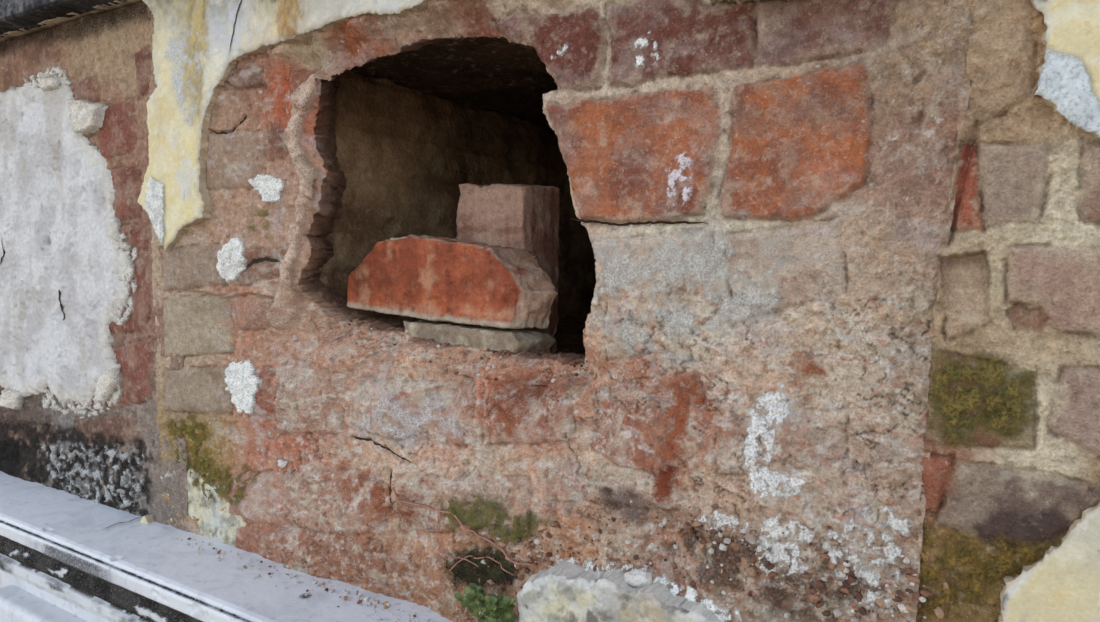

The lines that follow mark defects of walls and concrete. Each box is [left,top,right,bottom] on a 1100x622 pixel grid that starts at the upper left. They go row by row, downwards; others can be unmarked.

leakage [0,421,153,517]
spalling [0,1,204,536]
spalling [151,0,974,622]
spalling [916,0,1100,622]